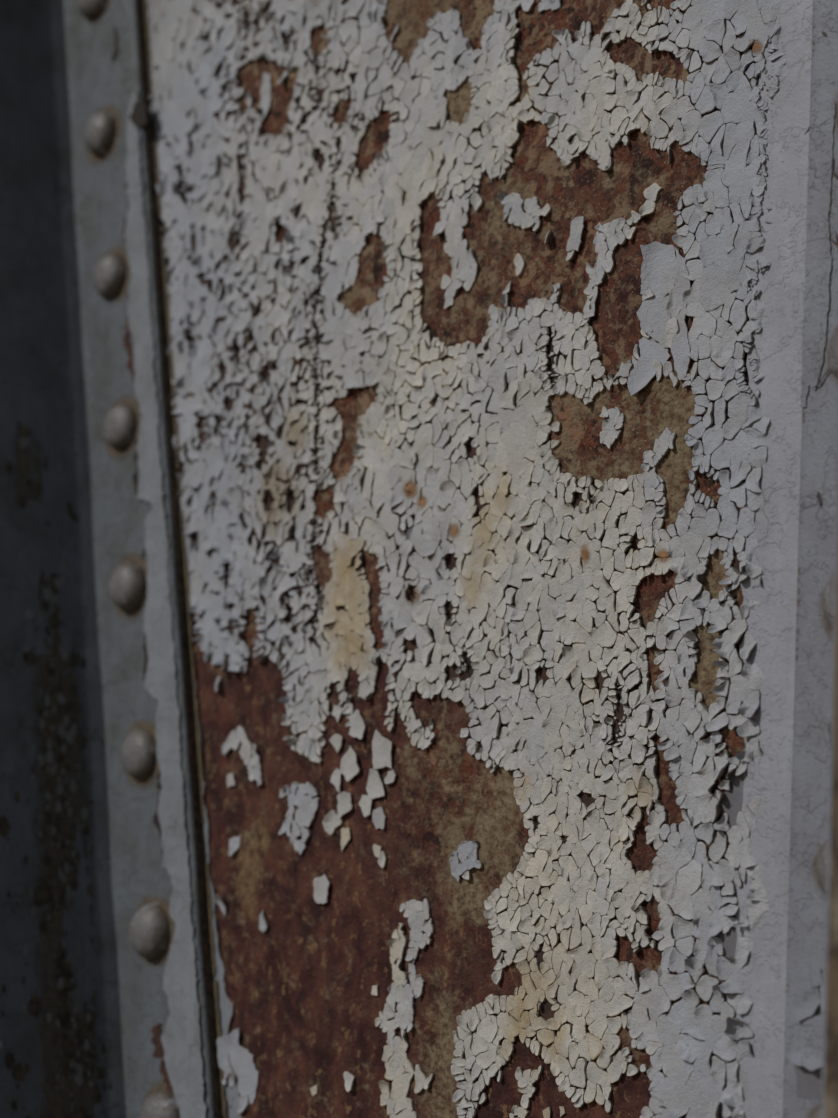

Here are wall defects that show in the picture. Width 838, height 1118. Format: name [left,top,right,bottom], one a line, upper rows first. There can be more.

crack [305,165,339,476]
crack [547,332,560,386]
rust [419,120,722,531]
crack [742,352,750,386]
crack [307,521,323,648]
rust [141,0,694,1118]
peeling [143,0,787,1118]
crack [462,651,477,681]
crack [612,684,632,747]
crack [153,768,163,859]
crack [150,1023,175,1097]
peeling [789,968,824,1099]